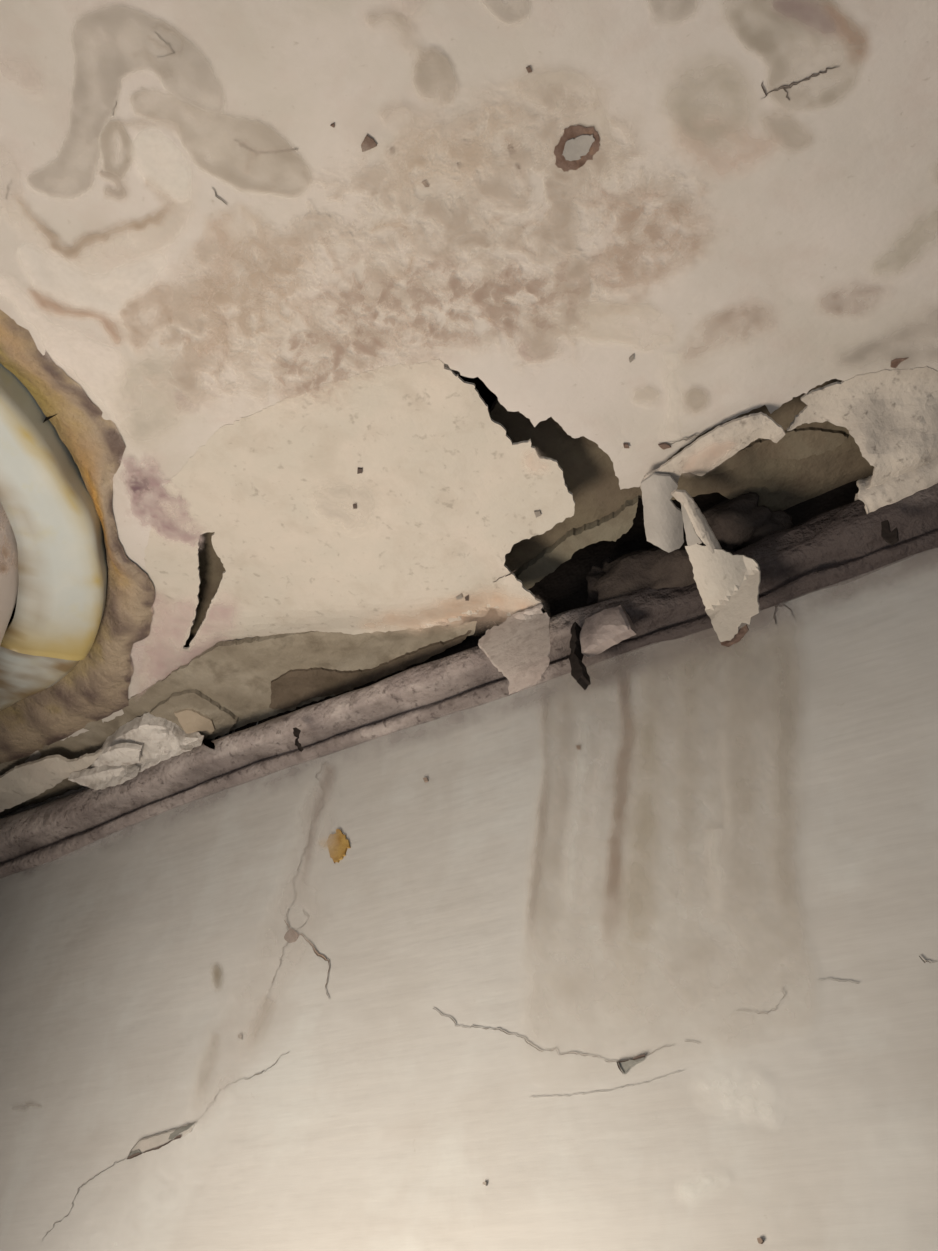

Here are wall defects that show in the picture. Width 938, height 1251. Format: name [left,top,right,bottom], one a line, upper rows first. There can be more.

water stain [28,6,311,199]
water stain [414,51,455,102]
water stain [650,0,697,21]
water stain [671,0,864,166]
water stain [0,72,700,436]
peeling [0,359,575,817]
peeling [640,357,938,647]
water stain [543,654,672,921]
crack [195,1052,289,1123]
crack [433,1008,698,1098]